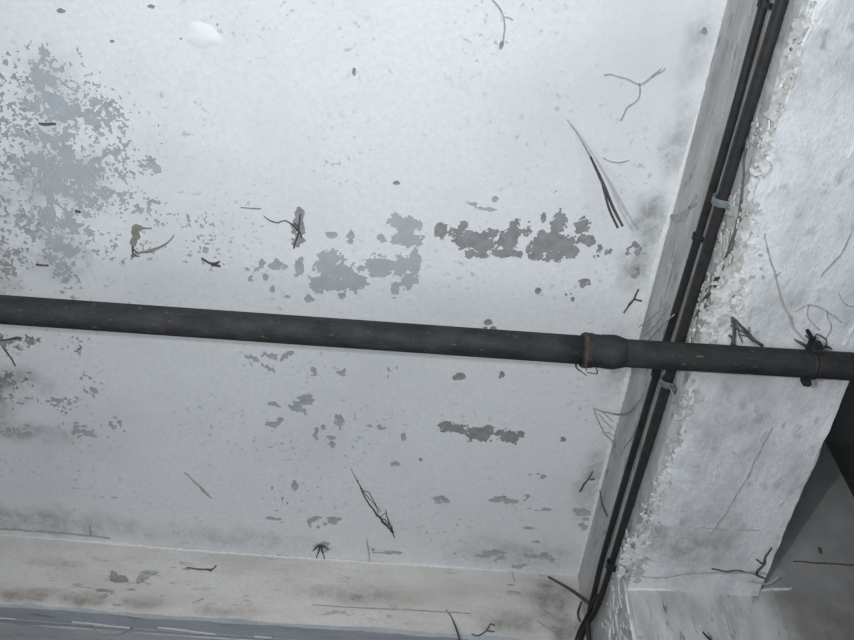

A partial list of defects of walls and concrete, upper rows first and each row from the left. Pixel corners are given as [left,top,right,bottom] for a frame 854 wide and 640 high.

peeling [245,206,613,303]
peeling [625,241,645,256]
peeling [245,351,294,373]
peeling [265,392,315,428]
peeling [312,414,345,449]
peeling [437,421,525,445]